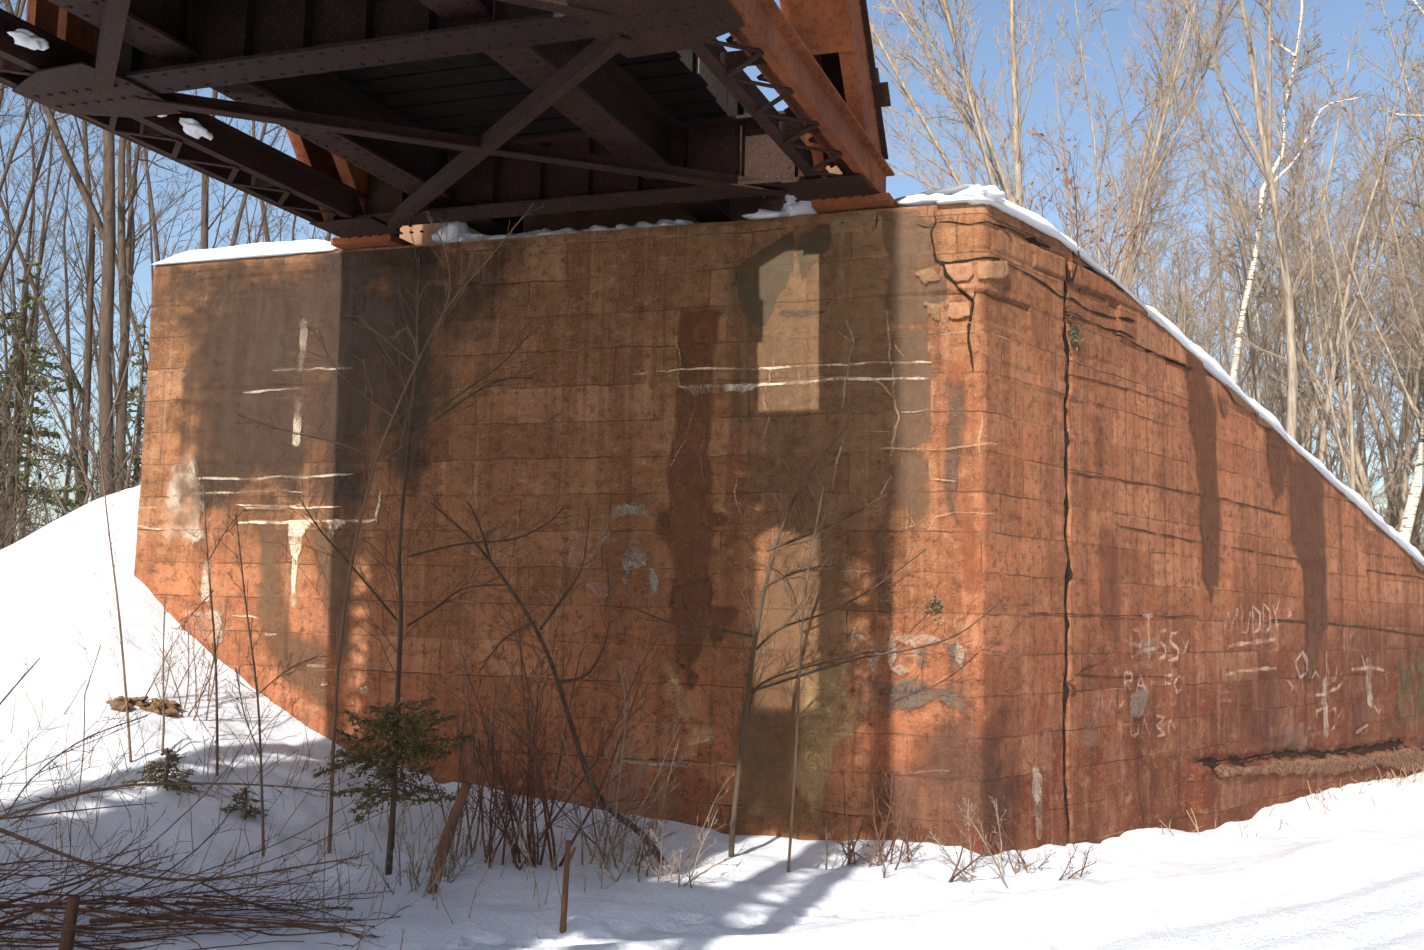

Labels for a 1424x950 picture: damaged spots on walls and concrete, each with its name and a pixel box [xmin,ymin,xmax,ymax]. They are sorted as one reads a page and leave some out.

spalling [831,214,873,233]
spalling [916,260,1009,321]
water stain [669,209,947,612]
water stain [947,387,962,512]
crack [917,214,1299,844]
crack [1366,569,1424,579]
crack [1269,619,1424,636]
spalling [1214,746,1424,778]